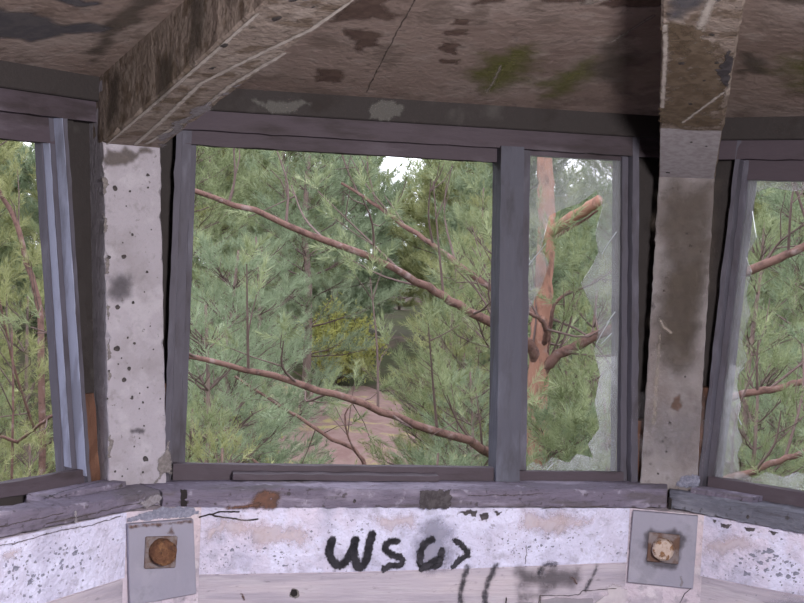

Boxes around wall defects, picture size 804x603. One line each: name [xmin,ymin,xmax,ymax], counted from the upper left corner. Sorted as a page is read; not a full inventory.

leakage [0,0,157,54]
crack [366,0,415,92]
leakage [439,19,469,64]
crack [199,511,258,521]
corrosion [227,490,280,509]
crack [538,588,616,603]